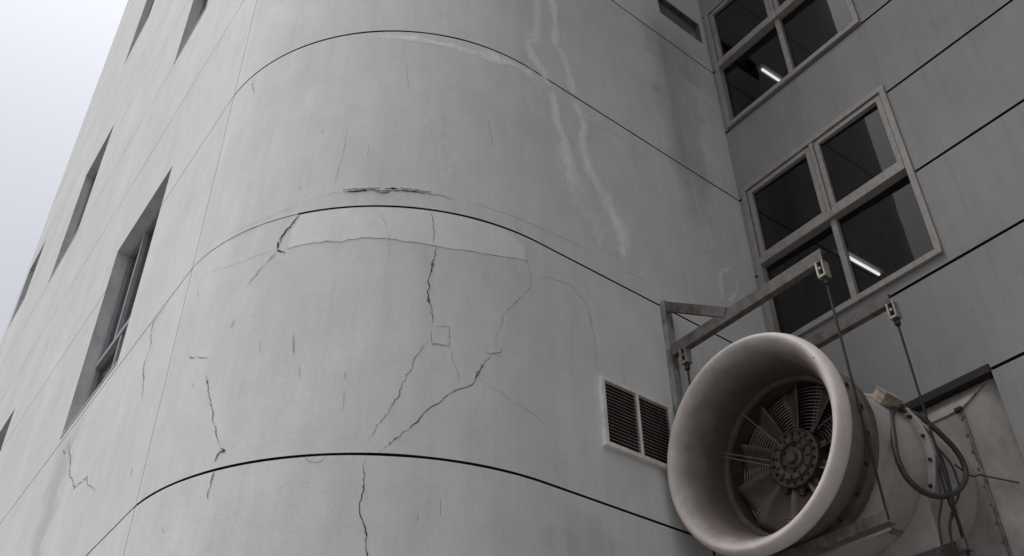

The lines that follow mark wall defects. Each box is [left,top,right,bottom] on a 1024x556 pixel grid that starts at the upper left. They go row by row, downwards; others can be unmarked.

crack [203,214,300,285]
spalling [314,187,451,199]
water stain [392,0,631,256]
crack [189,356,225,499]
crack [359,214,587,556]